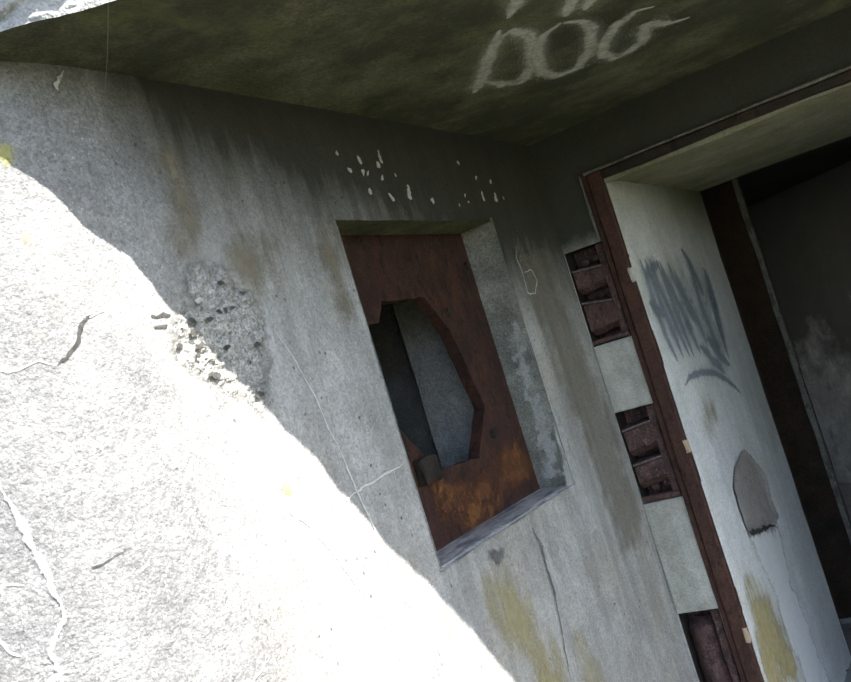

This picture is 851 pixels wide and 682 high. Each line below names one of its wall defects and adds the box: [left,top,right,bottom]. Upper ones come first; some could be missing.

spalling [0,0,115,32]
crack [0,310,105,373]
spalling [151,261,272,418]
spalling [734,449,779,537]
crack [0,486,79,682]